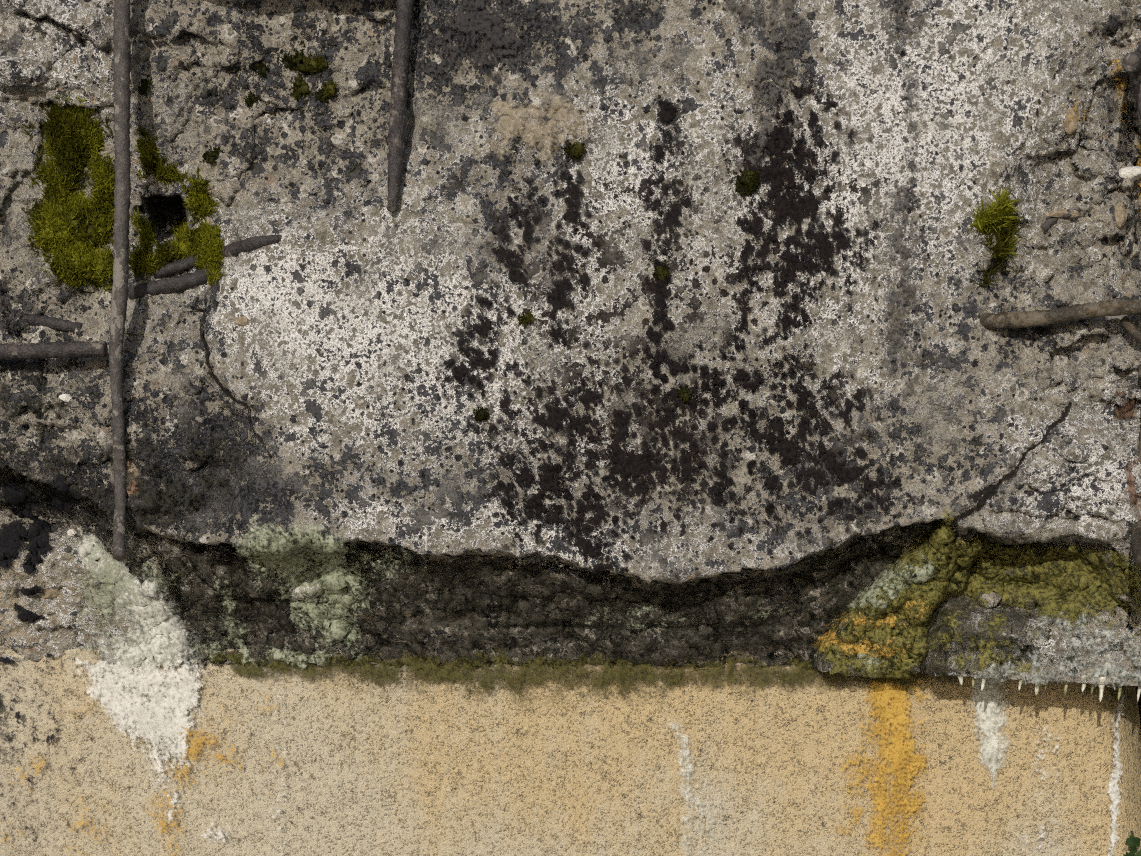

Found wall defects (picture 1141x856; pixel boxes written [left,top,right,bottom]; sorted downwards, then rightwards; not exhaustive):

water stain [882,0,930,131]
spalling [0,0,943,672]
water stain [486,170,545,288]
water stain [537,140,601,348]
water stain [640,98,698,271]
water stain [878,174,929,377]
spalling [980,0,1141,494]
crack [939,402,1072,541]
water stain [14,584,46,623]
spalling [930,520,1141,639]
water stain [0,702,57,794]
corrosion [836,678,928,856]